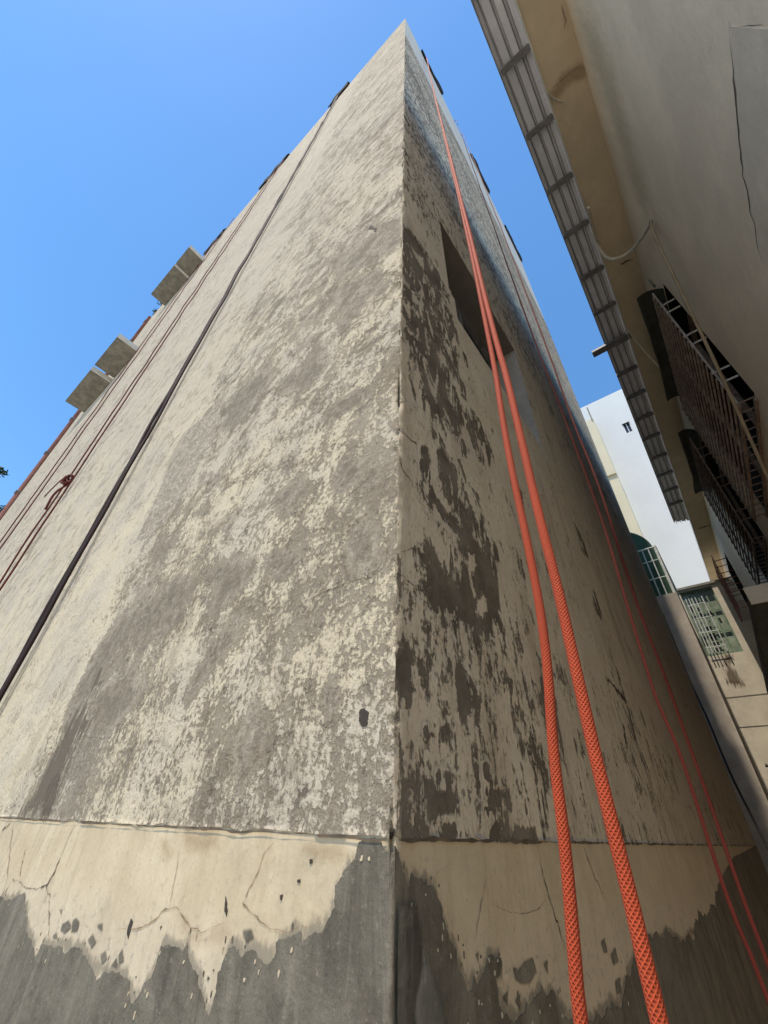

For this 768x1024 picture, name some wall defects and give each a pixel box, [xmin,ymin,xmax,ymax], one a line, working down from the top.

crack [729,25,762,260]
crack [0,817,749,948]